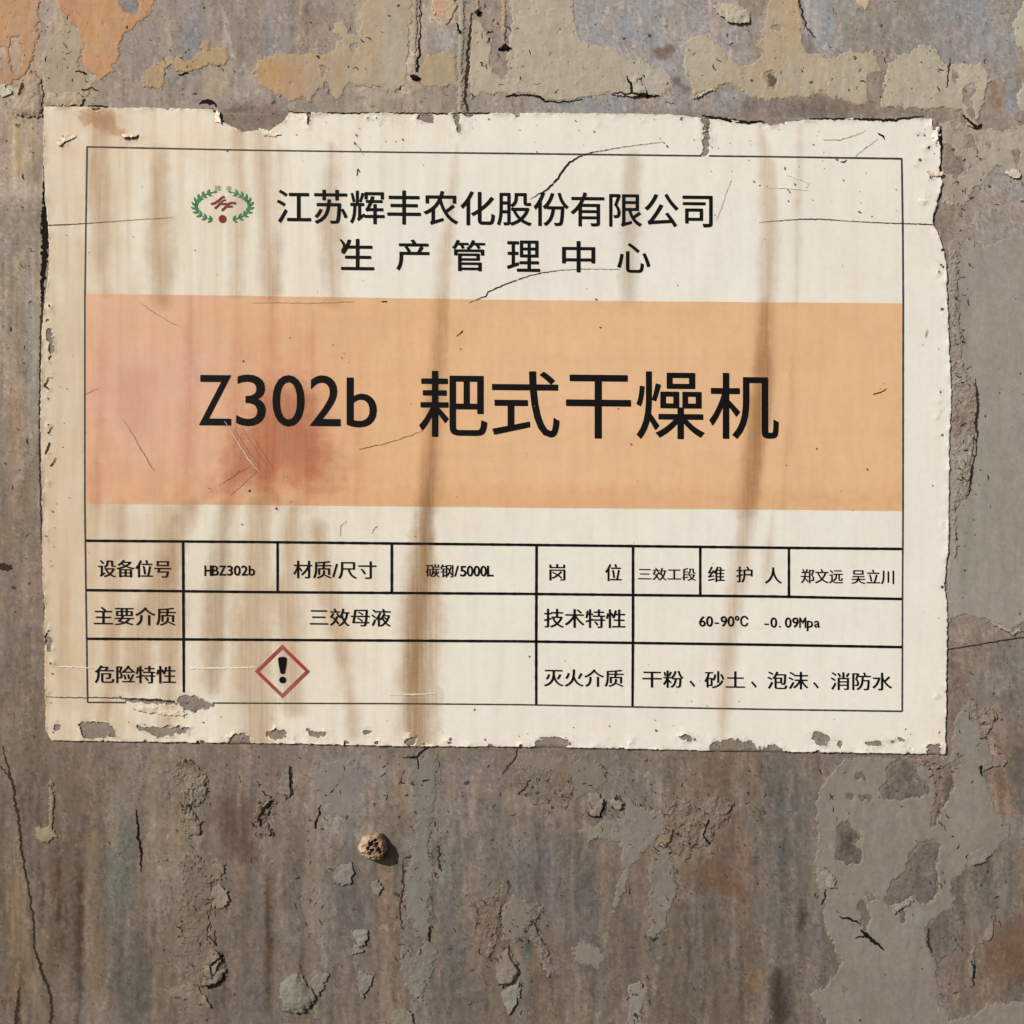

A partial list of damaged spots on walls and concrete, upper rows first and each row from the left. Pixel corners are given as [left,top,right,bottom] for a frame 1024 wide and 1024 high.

peeling [0,0,156,106]
peeling [223,0,674,113]
peeling [682,0,1024,207]
peeling [946,233,1024,636]
crack [0,746,54,1024]
peeling [391,752,442,1024]
crack [373,746,549,1015]
peeling [516,748,721,944]
crack [487,747,781,949]
crack [816,867,884,950]
peeling [810,710,1024,1024]
crack [918,637,1024,927]